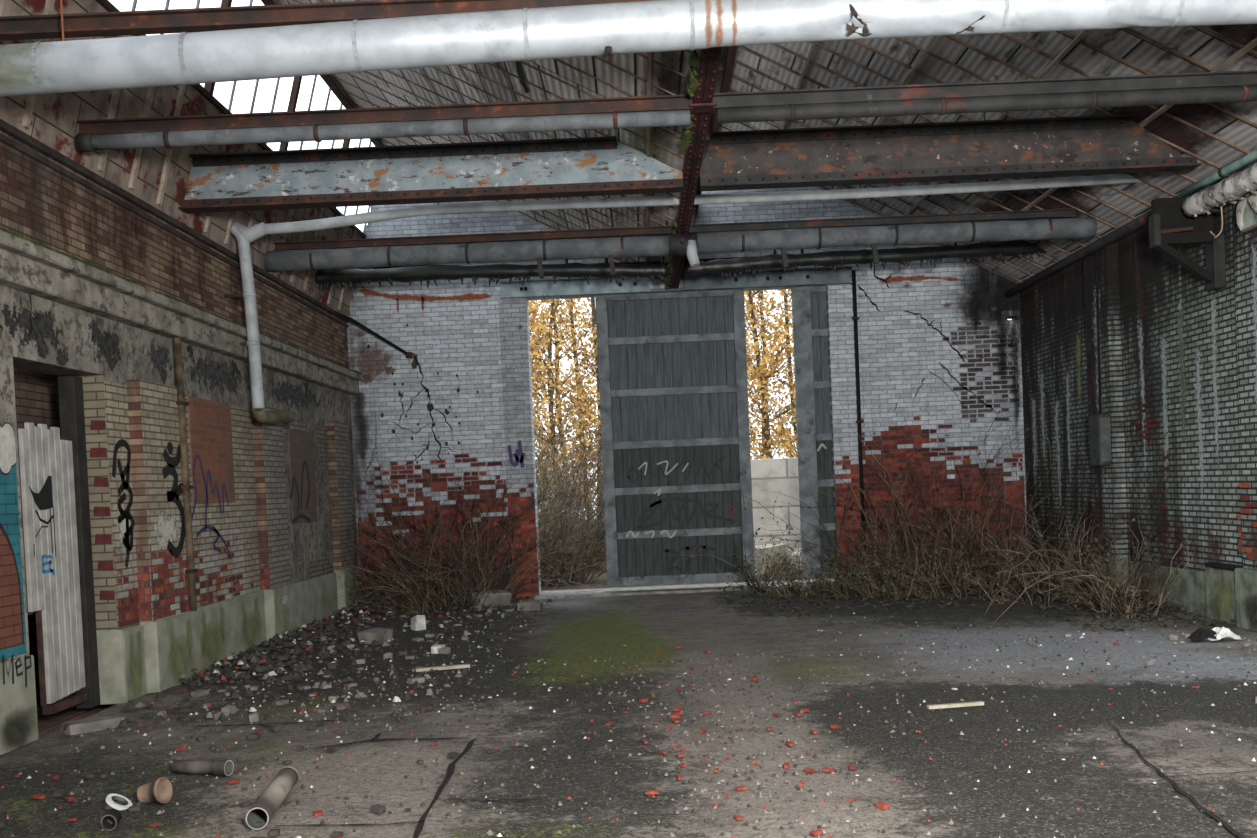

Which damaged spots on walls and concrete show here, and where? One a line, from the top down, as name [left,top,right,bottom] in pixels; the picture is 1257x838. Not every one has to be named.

crack [388,353,457,467]
peeling [356,353,539,604]
peeling [835,307,1027,582]
peeling [93,504,270,628]
crack [198,719,535,838]
crack [1110,724,1257,838]